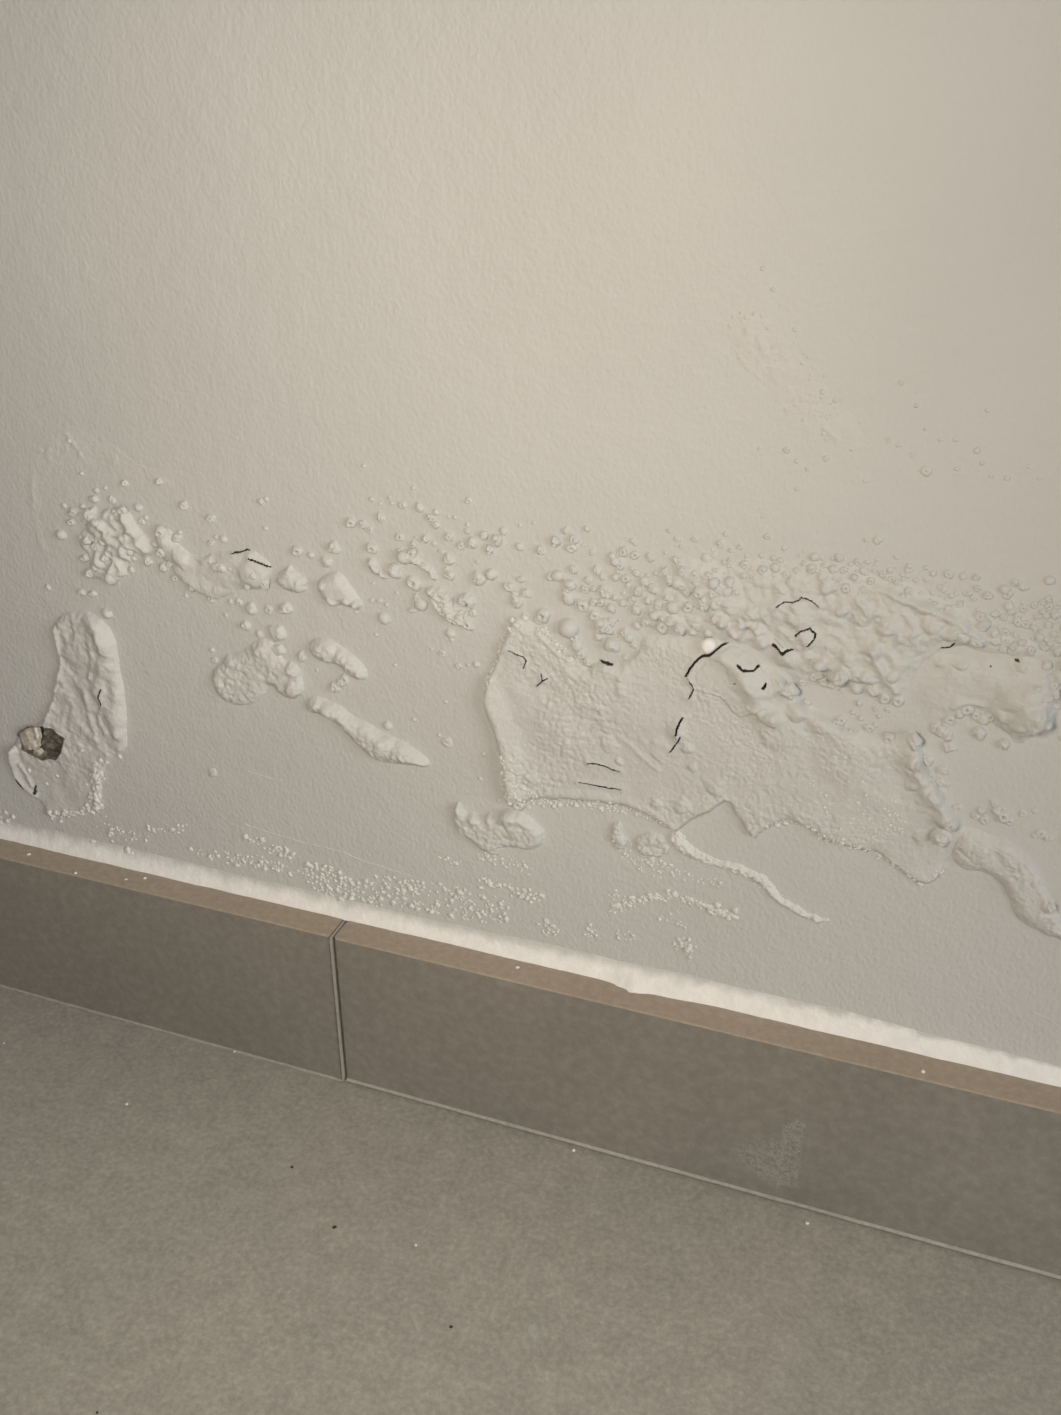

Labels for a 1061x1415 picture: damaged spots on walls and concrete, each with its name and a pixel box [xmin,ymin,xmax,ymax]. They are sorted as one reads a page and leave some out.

spalling [17,726,65,761]